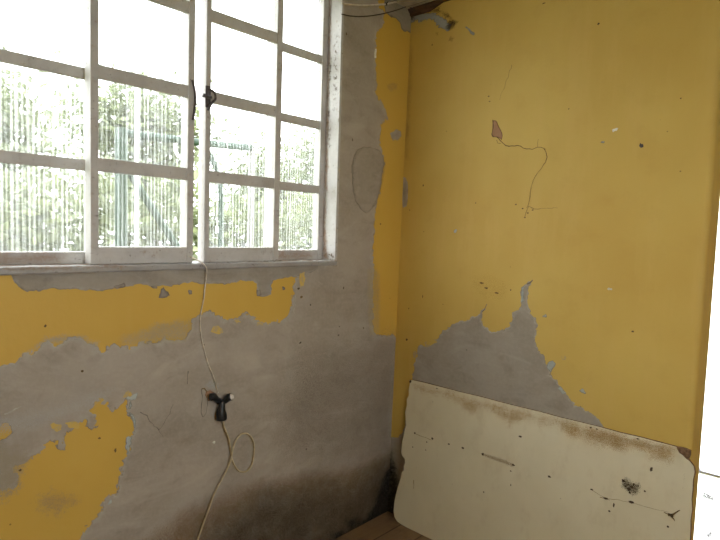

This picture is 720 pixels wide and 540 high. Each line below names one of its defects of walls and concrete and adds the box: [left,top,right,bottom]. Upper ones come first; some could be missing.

crack [497,137,551,218]
peeling [0,0,450,540]
peeling [412,280,603,427]
damp [139,448,400,540]